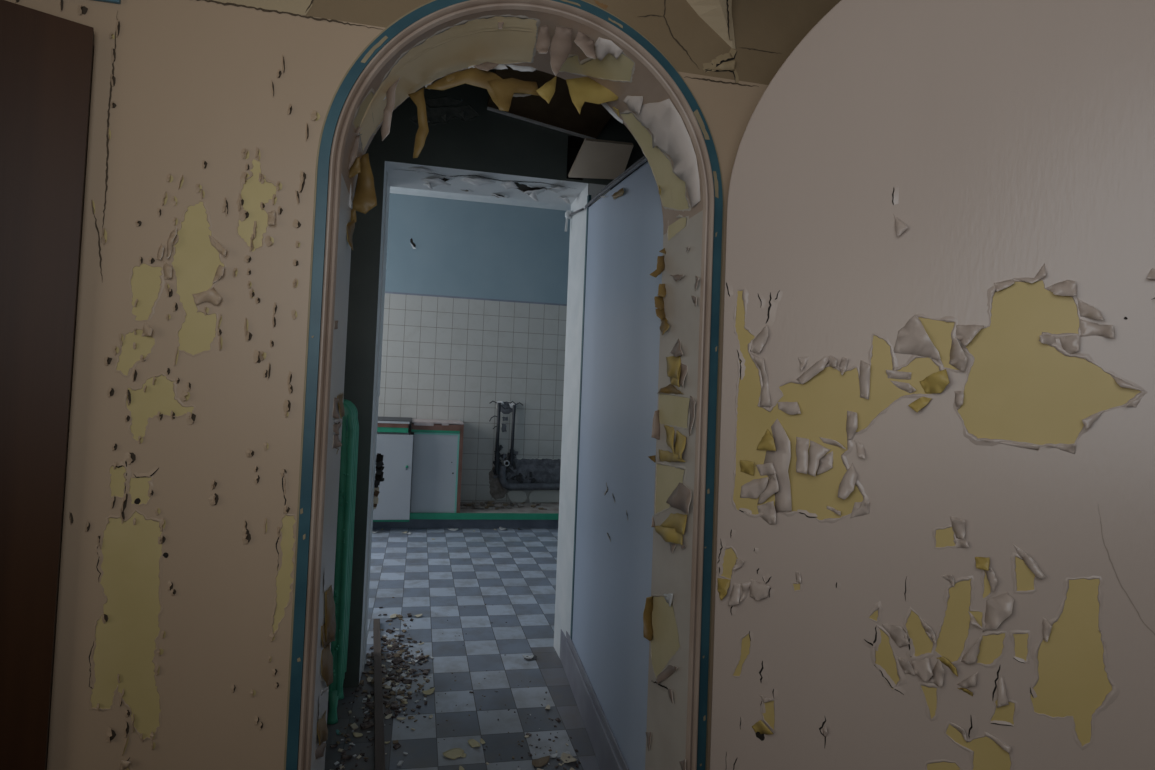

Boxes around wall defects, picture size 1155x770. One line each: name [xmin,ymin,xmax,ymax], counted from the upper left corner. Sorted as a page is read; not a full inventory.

peeling [104,147,283,512]
peeling [347,15,710,553]
peeling [726,263,1148,525]
peeling [643,593,682,703]
peeling [716,529,775,616]
peeling [861,516,1120,770]